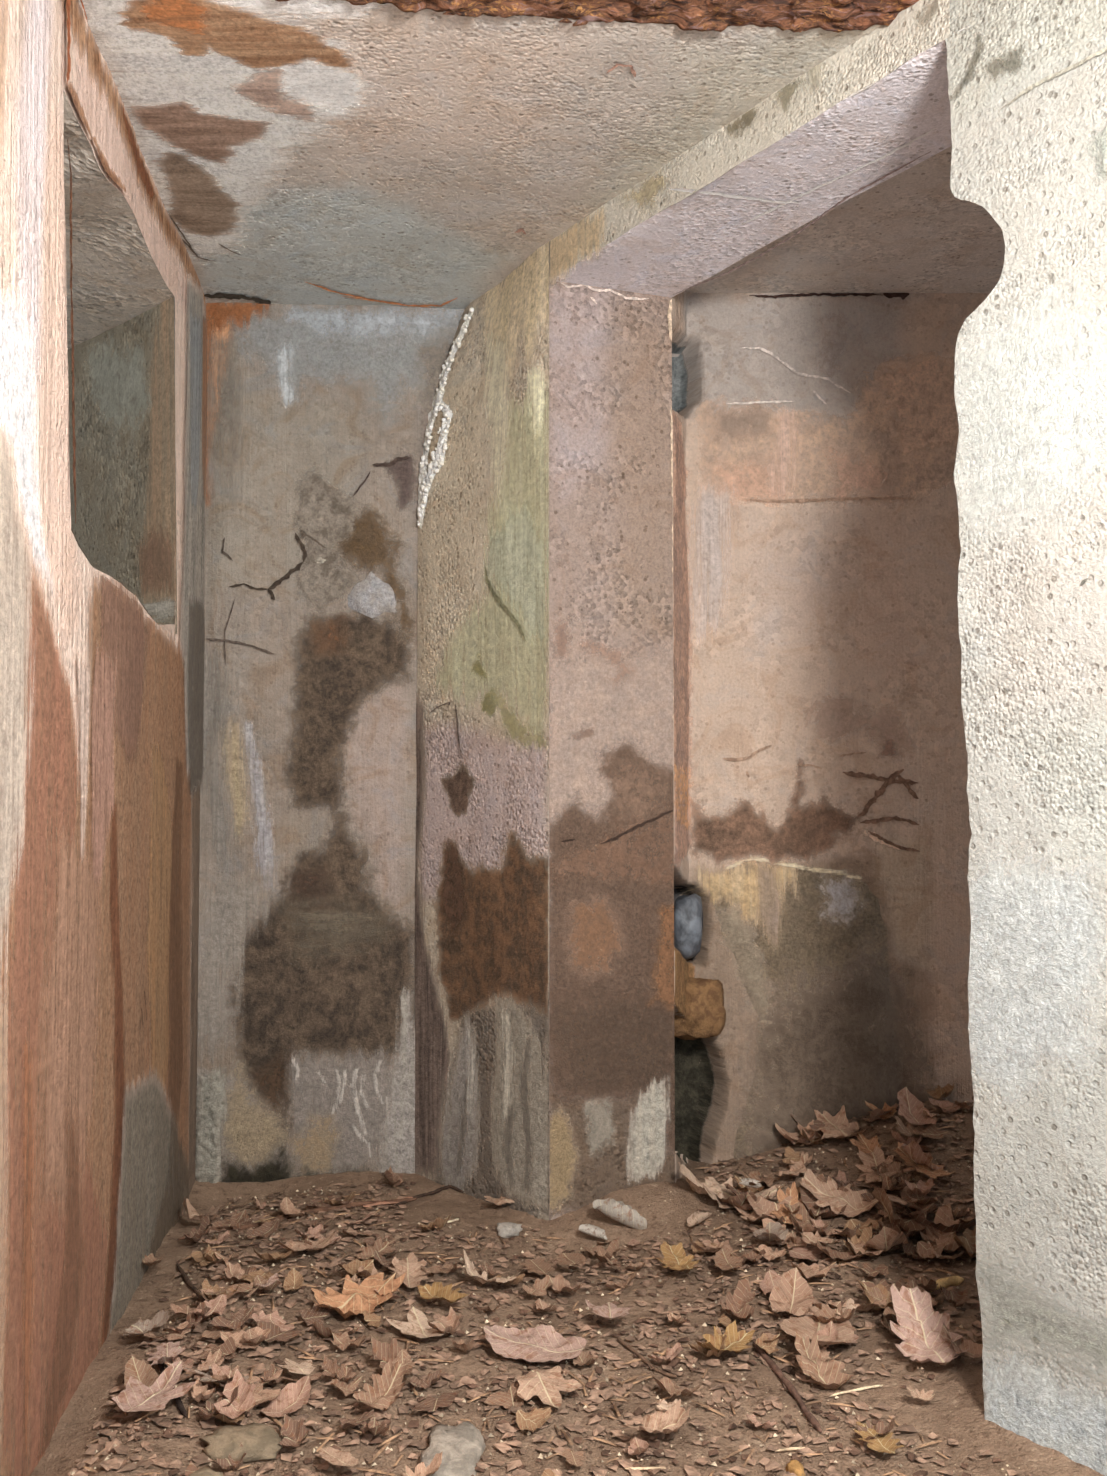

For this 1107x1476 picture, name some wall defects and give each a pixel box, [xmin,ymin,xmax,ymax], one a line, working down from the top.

rust [0,0,8,141]
rust [60,0,270,501]
damp [89,341,149,429]
crack [353,456,411,496]
crack [209,533,307,665]
damp [110,281,861,1334]
crack [723,745,920,852]
rust [0,297,192,1476]